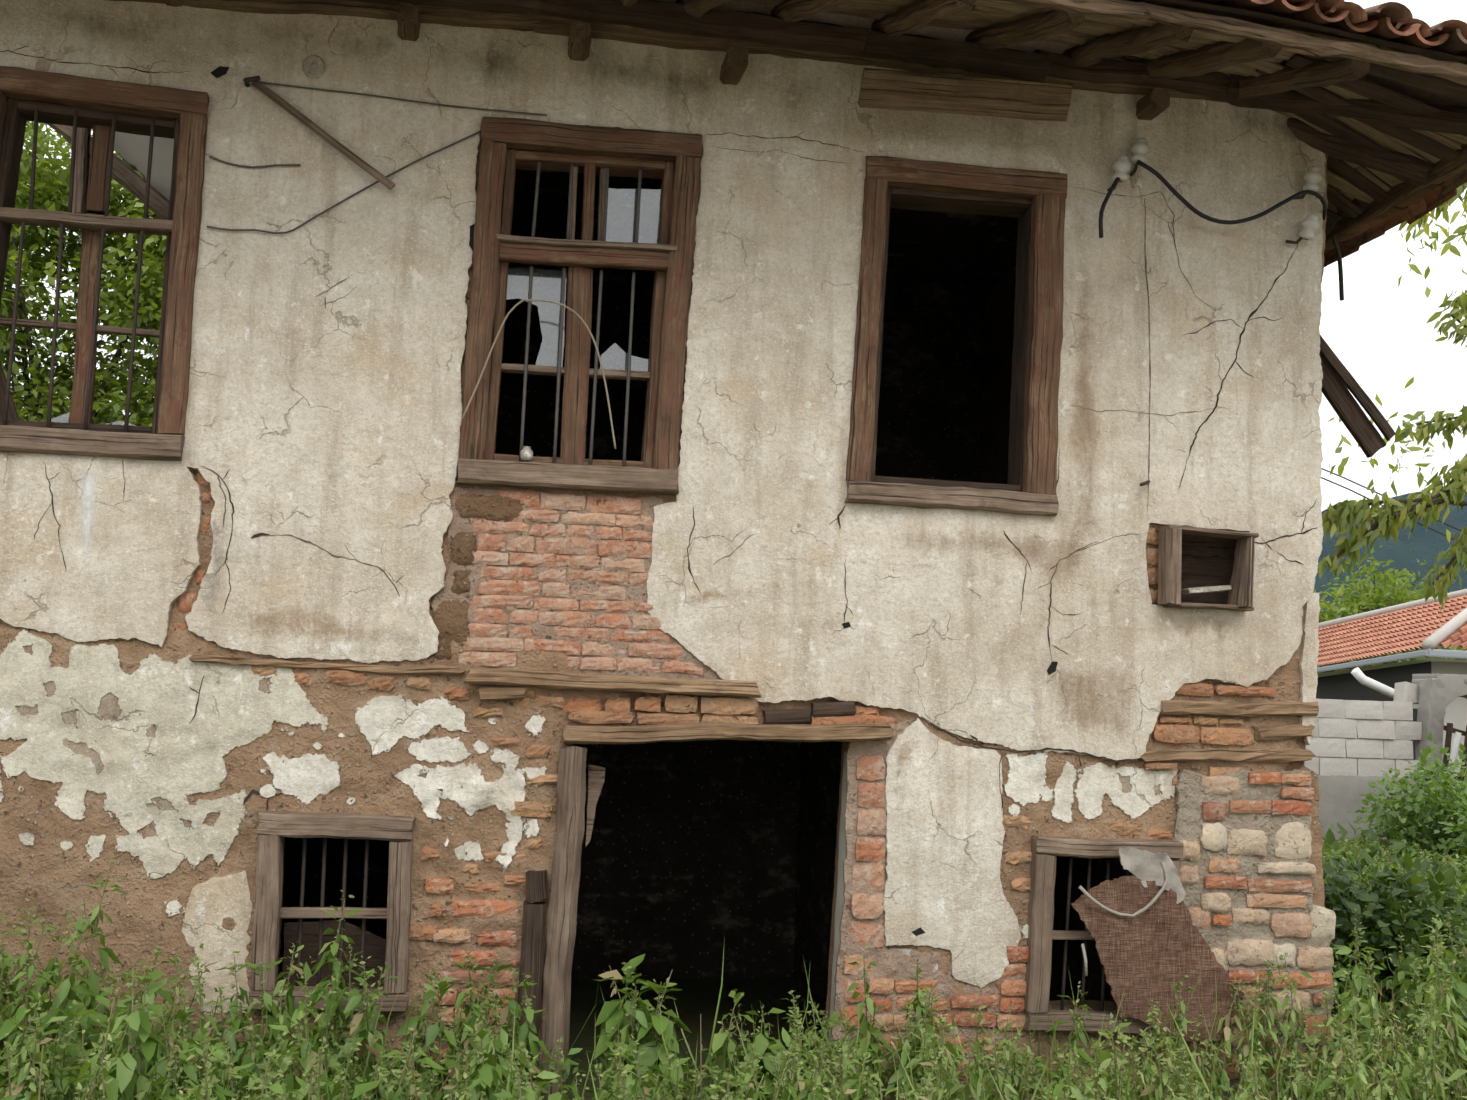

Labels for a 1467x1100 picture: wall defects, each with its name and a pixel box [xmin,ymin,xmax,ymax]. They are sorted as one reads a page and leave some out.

crack [34,463,67,572]
spalling [193,471,211,531]
crack [687,508,757,594]
crack [1004,186,1298,659]
peeling [0,487,1032,1100]
spalling [1002,681,1336,1100]